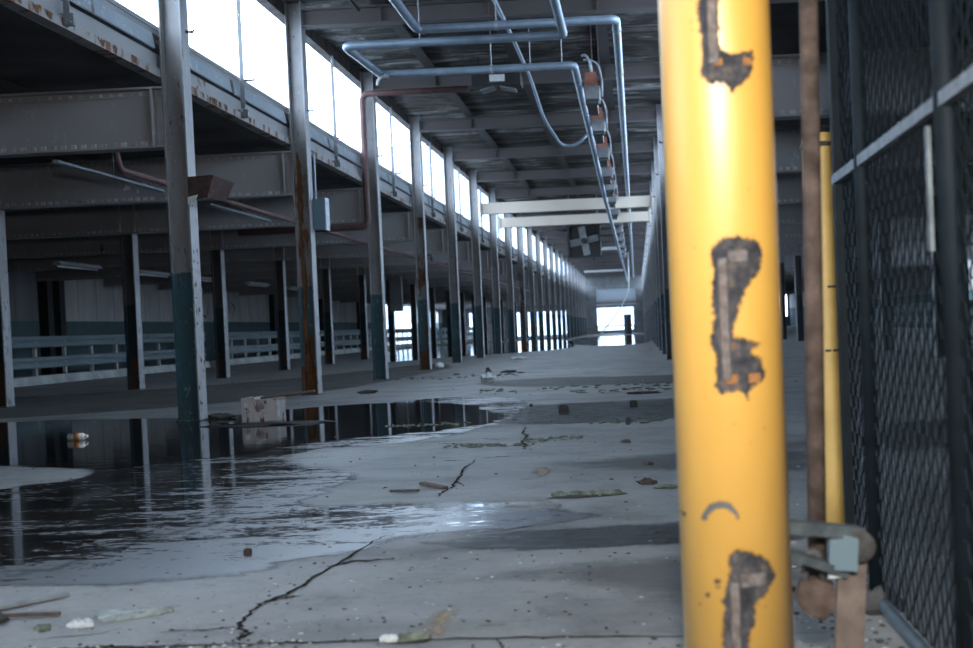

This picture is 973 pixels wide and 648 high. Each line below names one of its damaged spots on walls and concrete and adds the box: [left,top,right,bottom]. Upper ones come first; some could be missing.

rust [296,153,317,394]
crack [438,427,529,496]
crack [23,535,387,648]
crack [413,635,684,648]